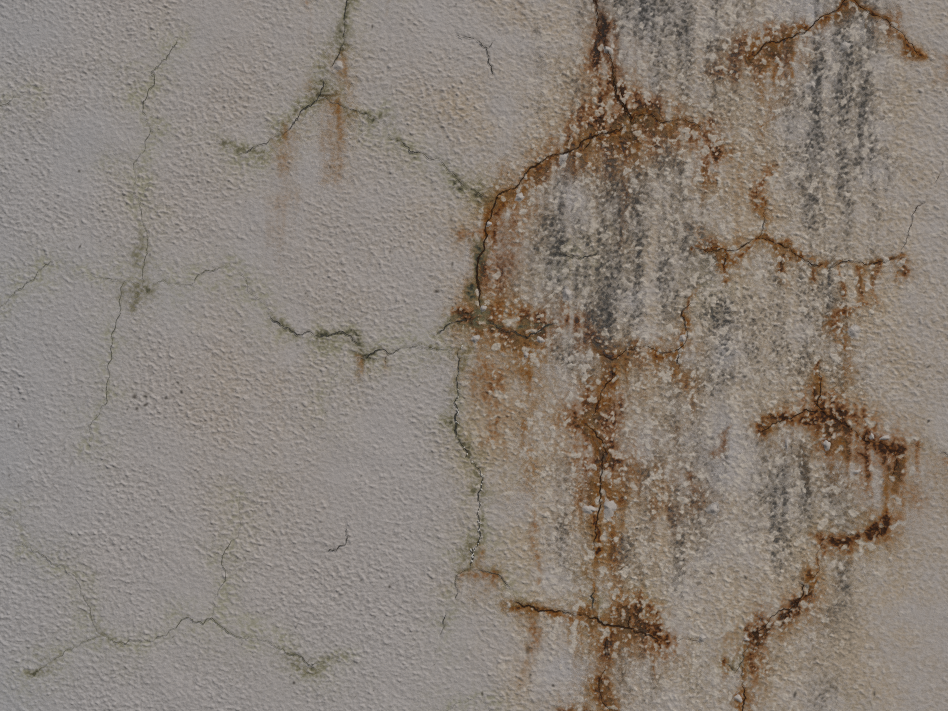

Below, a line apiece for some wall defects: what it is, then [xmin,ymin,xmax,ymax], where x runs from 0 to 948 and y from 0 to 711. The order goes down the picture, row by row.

leakage [603,0,692,92]
rust [706,0,927,84]
crack [747,0,927,77]
leakage [832,0,876,207]
crack [89,0,708,711]
rust [451,0,733,711]
leakage [534,156,652,349]
crack [691,175,940,276]
rust [828,259,882,351]
leakage [797,442,819,518]
rust [734,377,920,711]
crack [724,552,821,711]